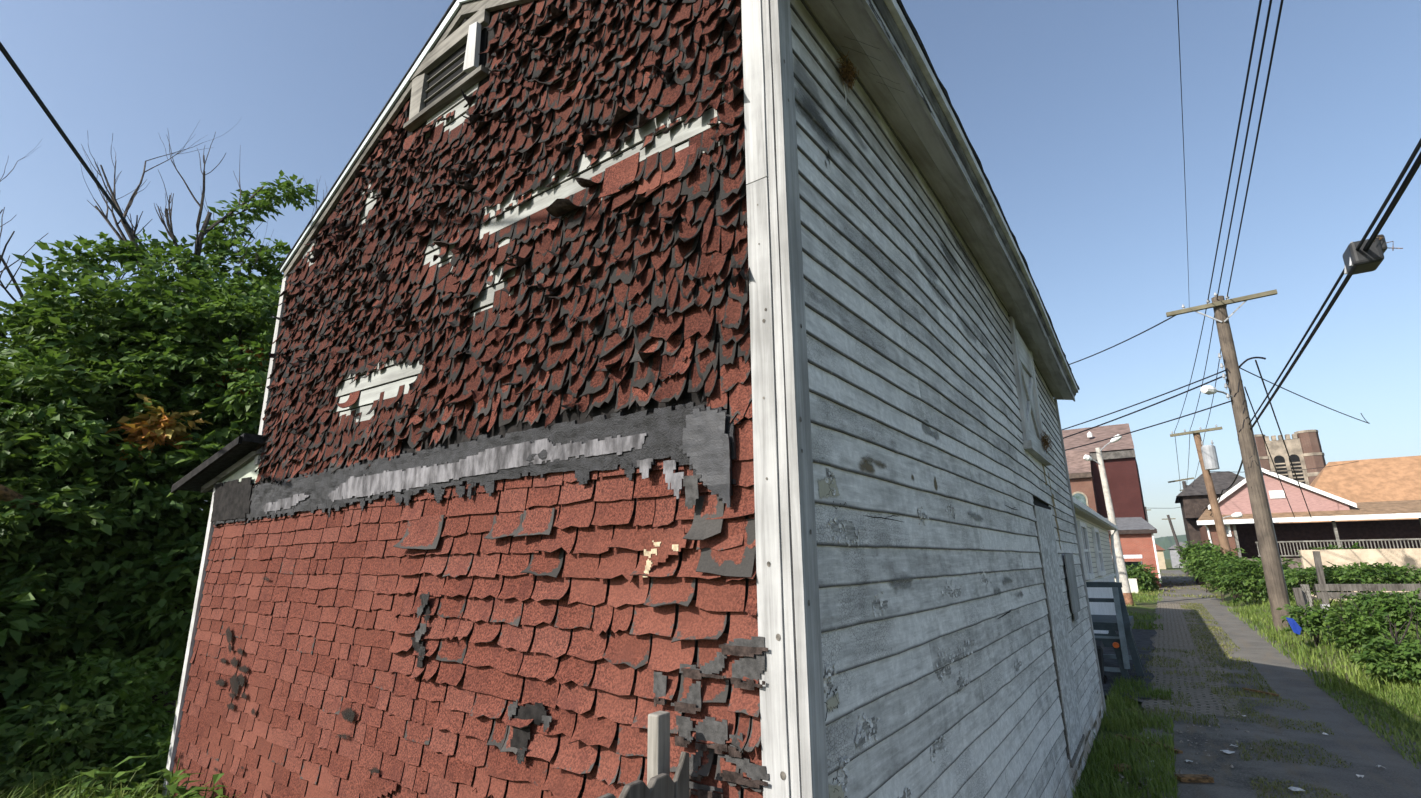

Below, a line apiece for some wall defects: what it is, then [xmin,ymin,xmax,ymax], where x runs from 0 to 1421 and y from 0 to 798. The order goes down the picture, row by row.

peeling [355,179,381,236]
peeling [415,81,725,330]
peeling [303,242,322,267]
peeling [333,344,423,424]
peeling [935,640,975,694]
peeling [837,712,880,792]